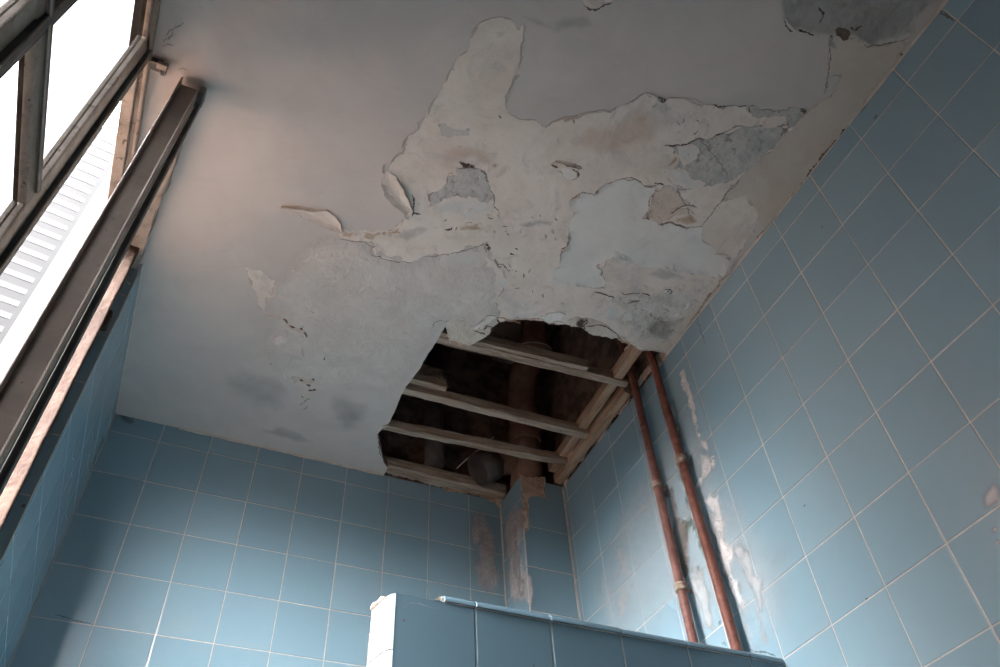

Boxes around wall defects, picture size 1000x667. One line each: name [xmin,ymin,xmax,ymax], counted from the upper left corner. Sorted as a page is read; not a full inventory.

peeling [342,17,808,462]
damp [694,453,713,490]
corrosion [664,489,688,576]